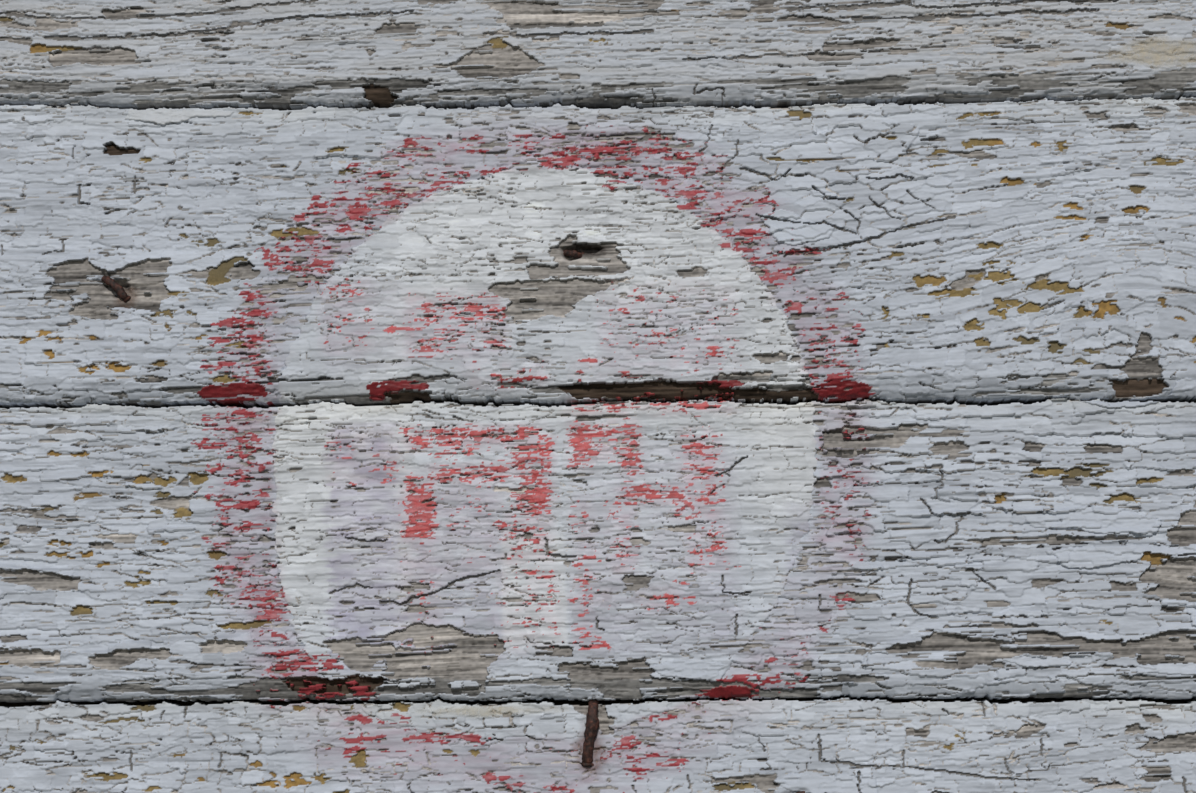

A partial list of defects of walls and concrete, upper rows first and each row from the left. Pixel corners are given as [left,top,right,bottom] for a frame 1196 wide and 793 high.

crack [632,90,661,143]
crack [682,51,957,258]
peeling [489,236,630,324]
peeling [559,352,818,405]
peeling [1075,333,1196,408]
peeling [886,464,1196,675]
crack [160,697,193,720]
peeling [284,624,505,711]
peeling [535,646,731,734]
crack [122,751,133,793]
crack [817,733,1044,793]
crack [1180,776,1188,793]